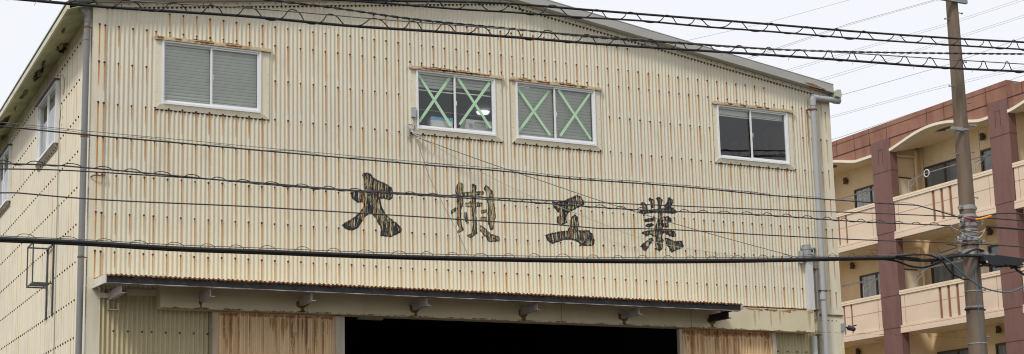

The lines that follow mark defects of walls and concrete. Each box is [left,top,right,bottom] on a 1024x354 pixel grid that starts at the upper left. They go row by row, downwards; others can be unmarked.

corrosion [91,25,120,83]
corrosion [87,103,118,234]
corrosion [130,13,830,313]
corrosion [194,297,340,354]
corrosion [673,318,782,354]